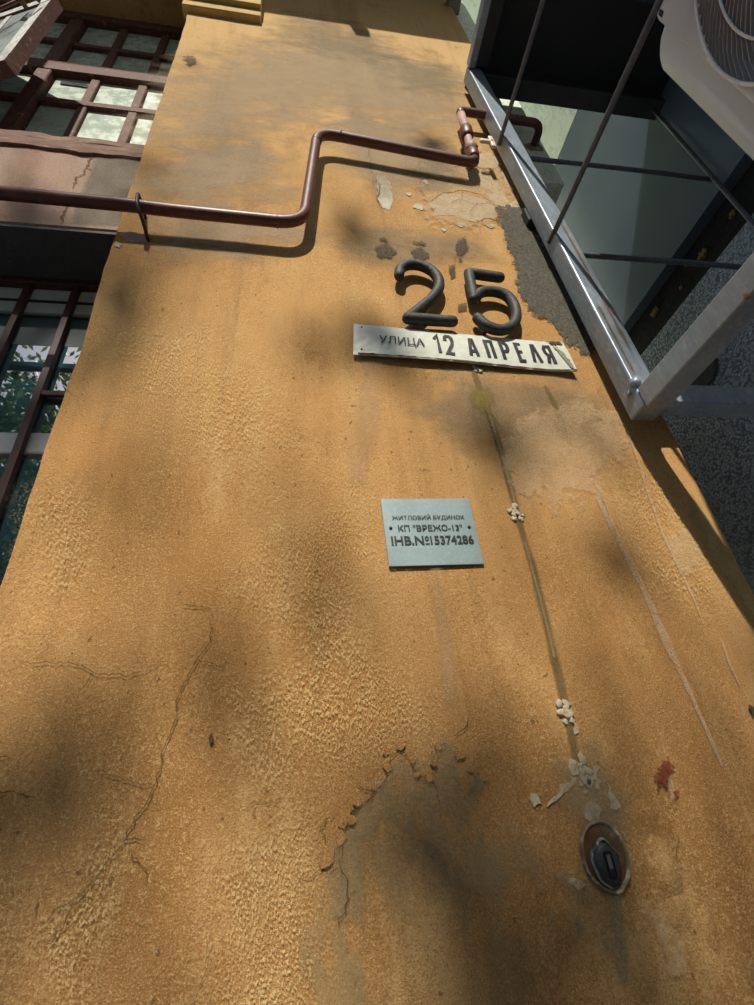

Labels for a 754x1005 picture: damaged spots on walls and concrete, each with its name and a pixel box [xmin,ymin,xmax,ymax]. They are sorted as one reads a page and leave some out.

damp [76,208,122,224]
damp [85,149,272,206]
flaking render [374,167,393,211]
damp [339,121,450,183]
flaking render [406,150,523,232]
damp [440,371,577,700]
crack [19,604,221,946]
peeling [530,751,621,821]
damp [564,716,617,821]
rust [654,757,680,796]
peeling [228,686,486,1005]